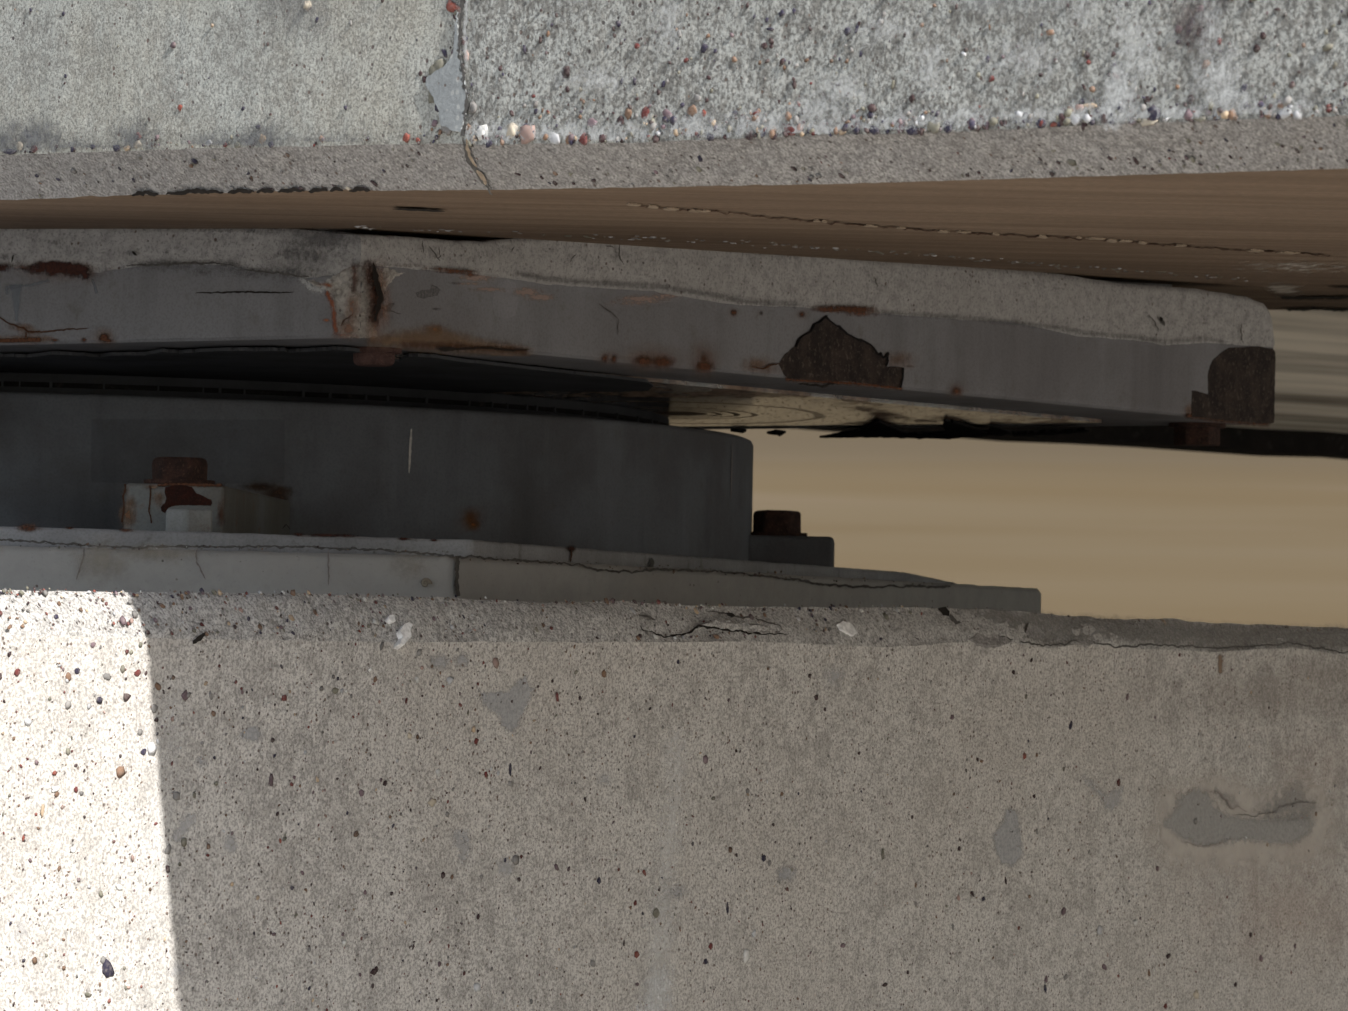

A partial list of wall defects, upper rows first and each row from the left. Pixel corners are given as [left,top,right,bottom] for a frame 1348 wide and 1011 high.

crack [456,0,469,136]
rust [0,261,90,280]
peeling [751,306,910,390]
crack [639,611,787,638]
spalling [1162,781,1330,866]